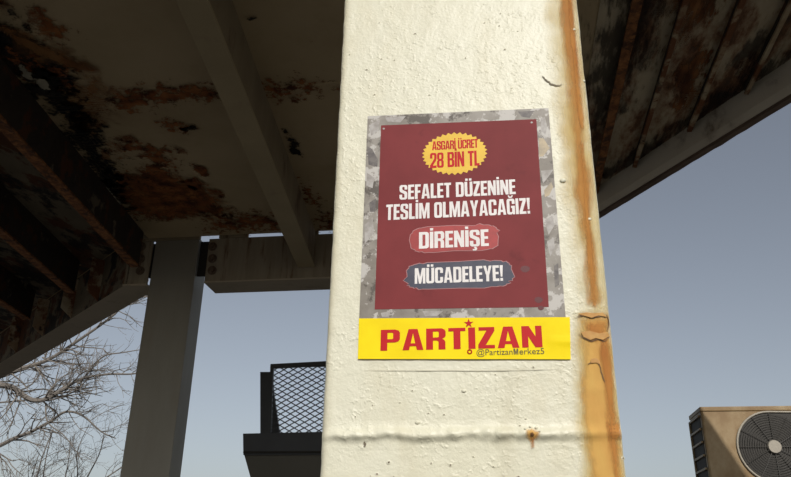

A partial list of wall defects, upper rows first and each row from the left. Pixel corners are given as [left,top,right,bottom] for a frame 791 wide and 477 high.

corrosion [55,76,222,135]
corrosion [93,135,281,236]
corrosion [297,177,334,233]
corrosion [559,0,601,305]
peeling [577,312,609,342]
corrosion [579,317,622,477]